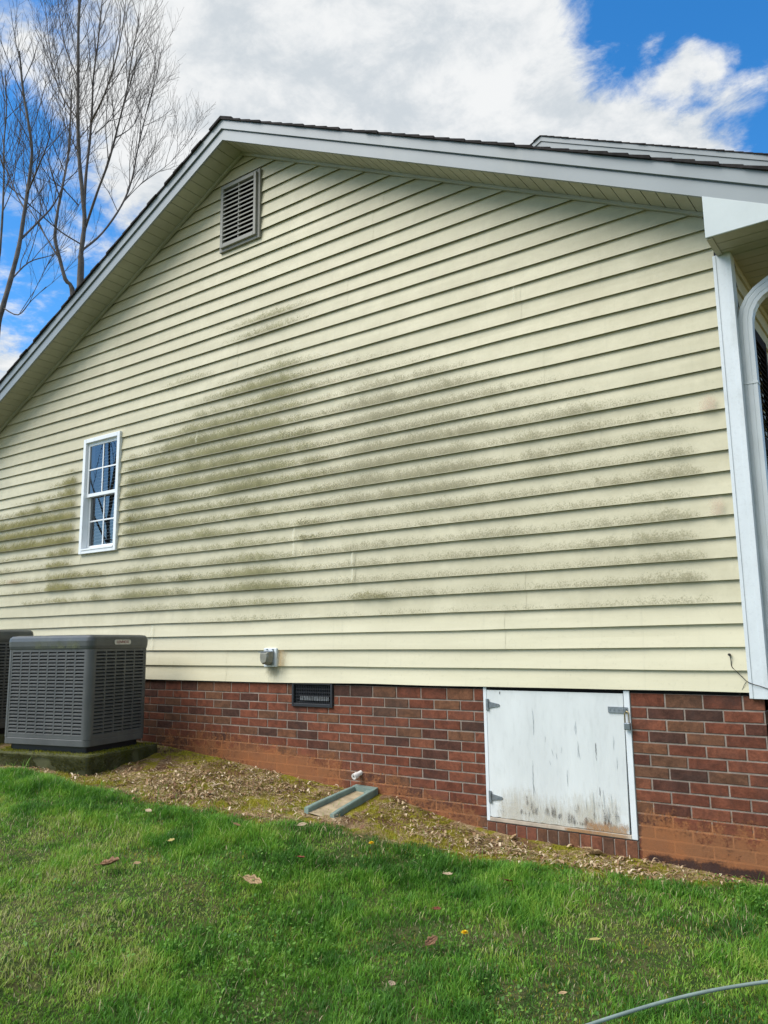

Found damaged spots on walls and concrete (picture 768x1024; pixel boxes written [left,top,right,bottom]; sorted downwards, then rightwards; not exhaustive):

water stain [0,357,610,611]